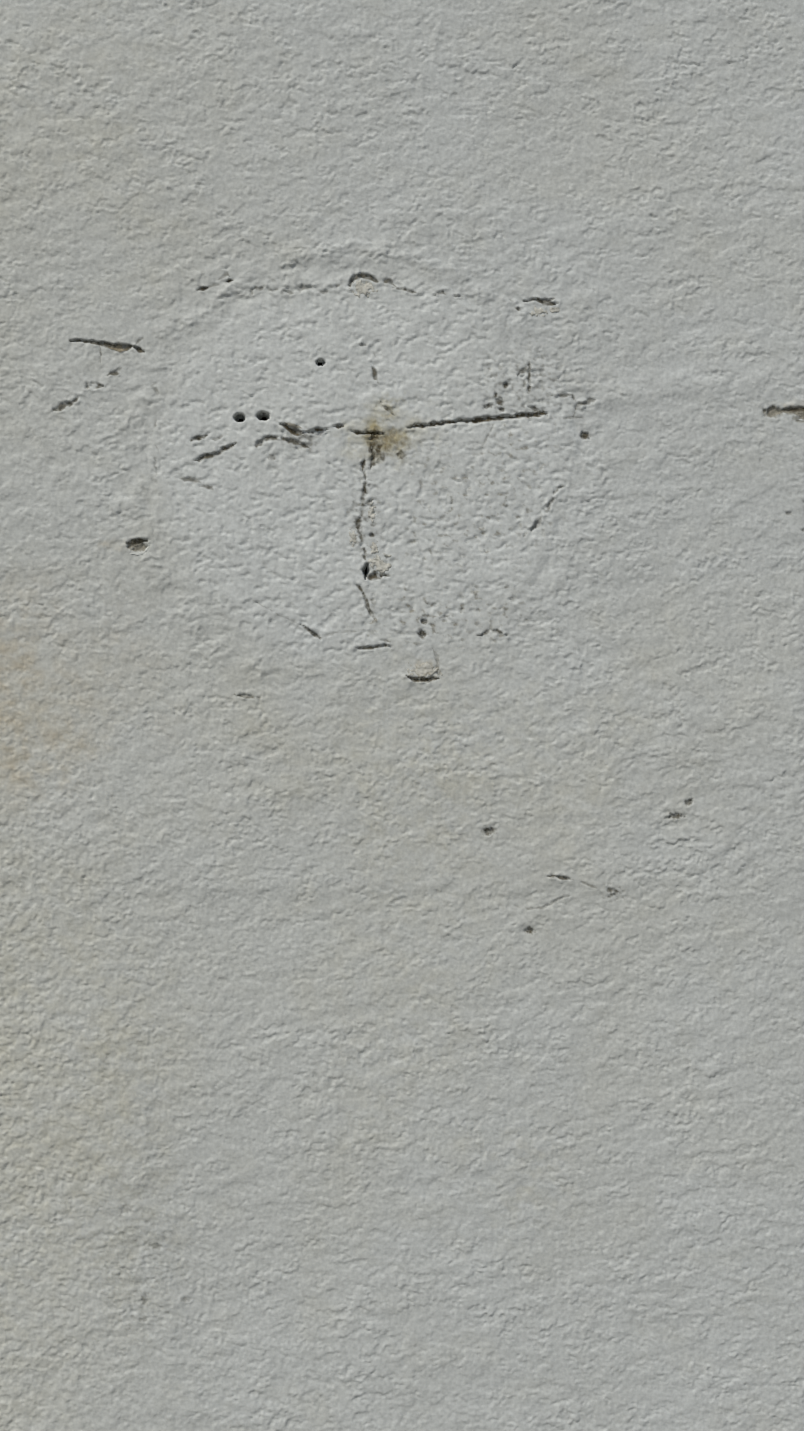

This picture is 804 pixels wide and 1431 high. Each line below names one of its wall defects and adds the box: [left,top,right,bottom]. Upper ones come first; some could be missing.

crack [372,368,590,428]
crack [181,423,343,489]
crack [349,474,387,649]